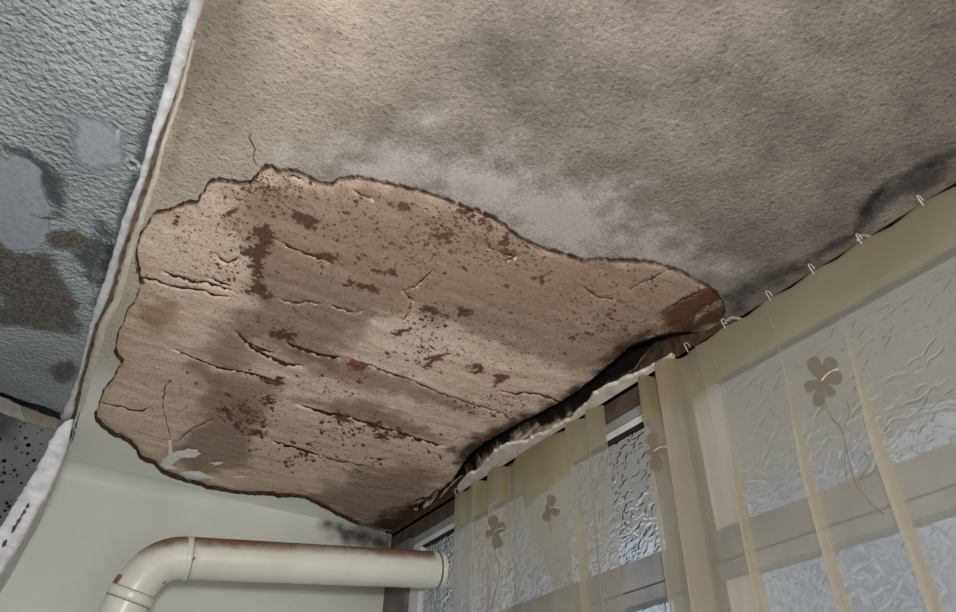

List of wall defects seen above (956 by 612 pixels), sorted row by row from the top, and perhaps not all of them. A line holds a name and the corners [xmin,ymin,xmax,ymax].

peeling [0,155,52,250]
damp [0,145,65,216]
peeling [74,117,125,171]
damp [346,150,679,262]
damp [816,152,956,255]
damp [0,221,113,335]
damp [49,361,78,384]
flaking render [94,163,726,531]
damp [0,423,44,484]